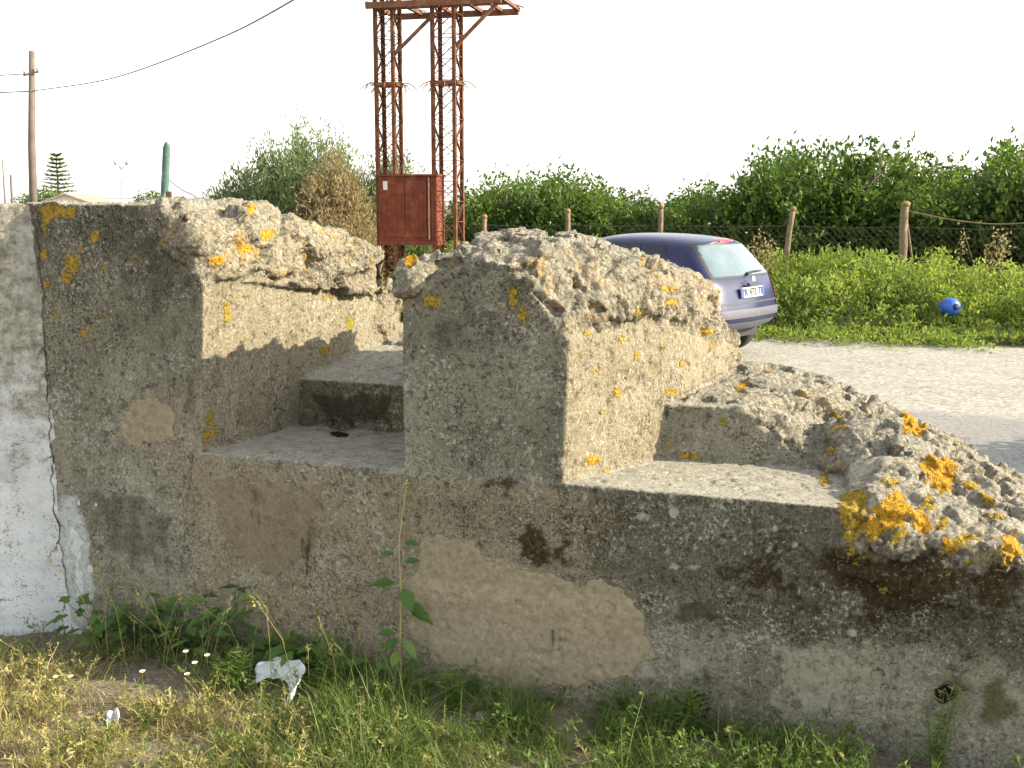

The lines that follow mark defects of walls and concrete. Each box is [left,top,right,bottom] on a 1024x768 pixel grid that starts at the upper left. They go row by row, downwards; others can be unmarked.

crack [10,210,68,609]
peeling [67,525,93,598]
spalling [25,196,1024,583]
peeling [402,528,656,691]